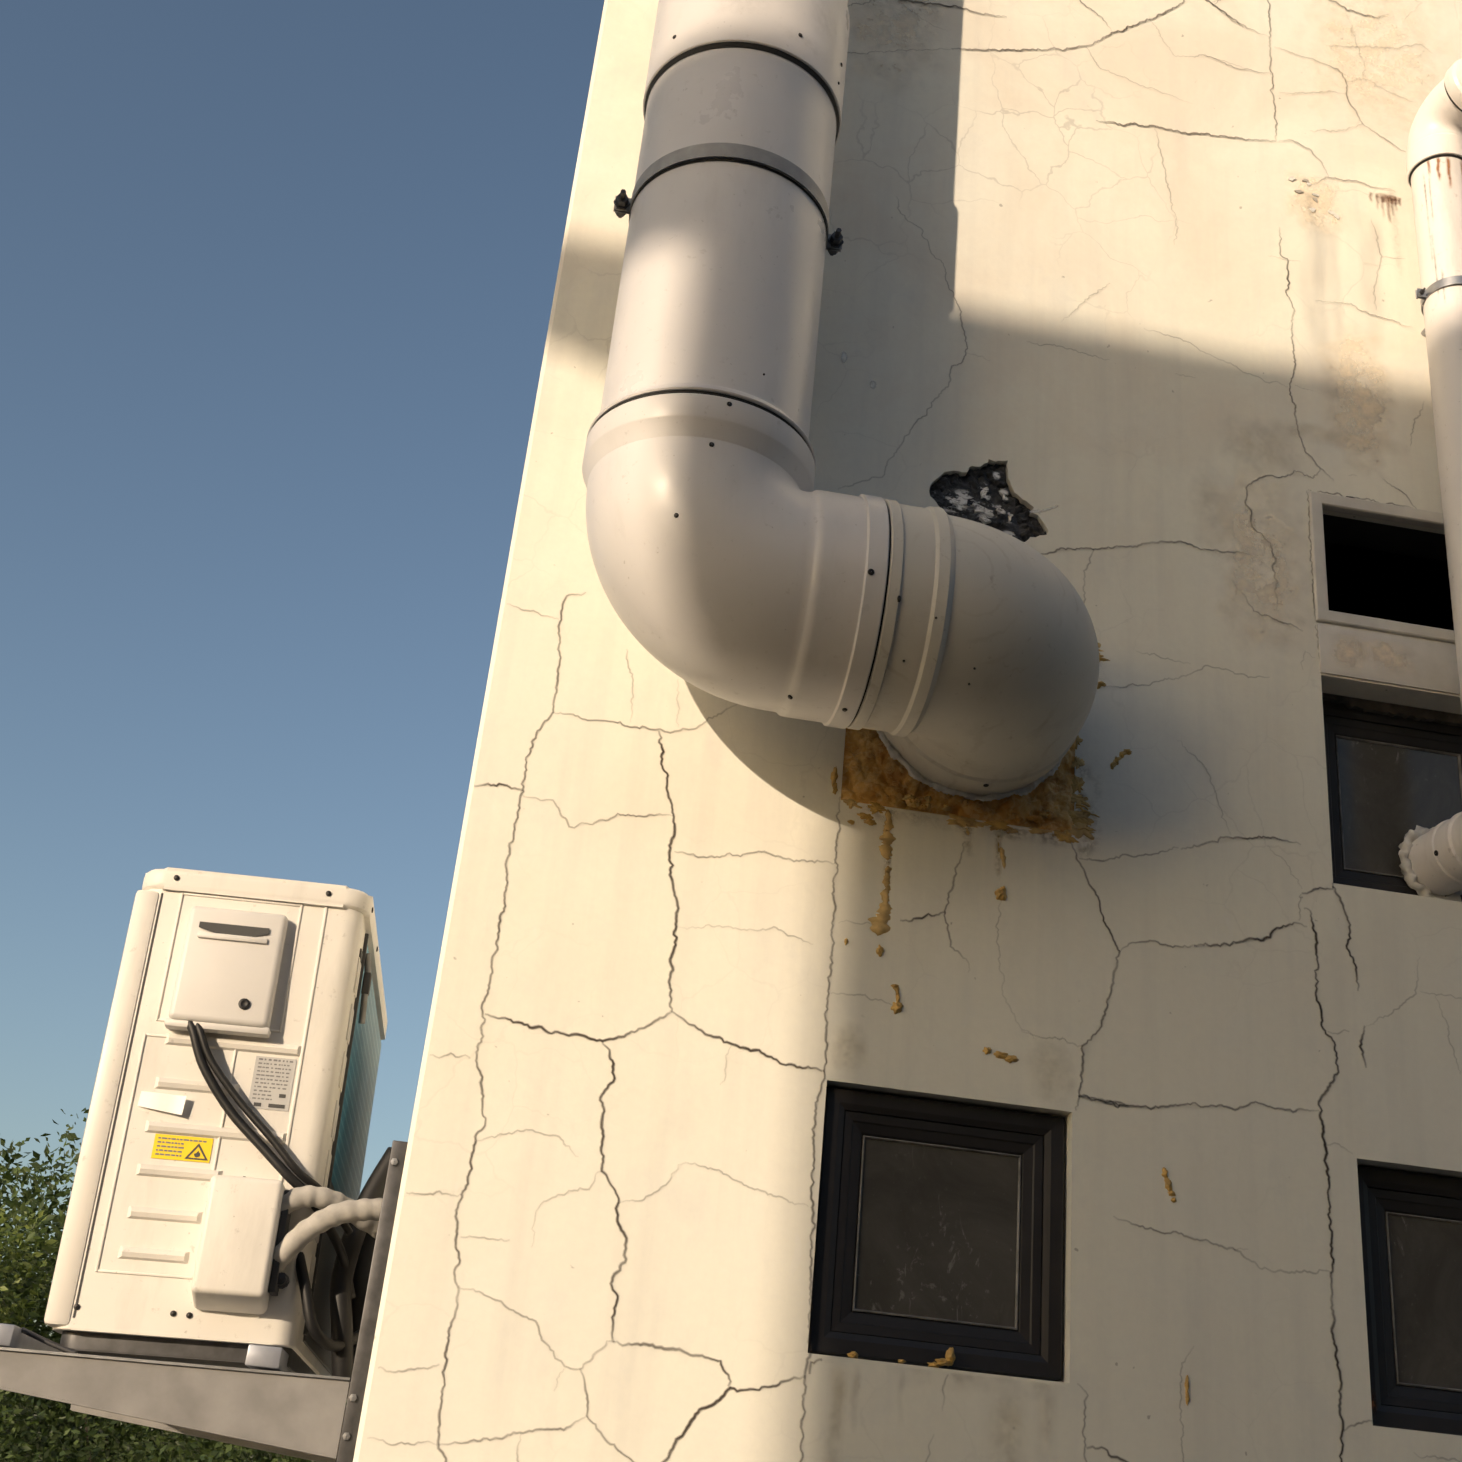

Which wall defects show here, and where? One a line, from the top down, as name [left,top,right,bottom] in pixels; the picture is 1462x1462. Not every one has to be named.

crack [900,0,1369,186]
rust [1427,159,1462,182]
spalling [929,464,1046,542]
crack [1047,446,1407,576]
crack [1223,834,1286,842]
crack [906,876,955,941]
crack [454,595,840,1462]
crack [1076,858,1365,1462]
crack [438,1321,476,1462]